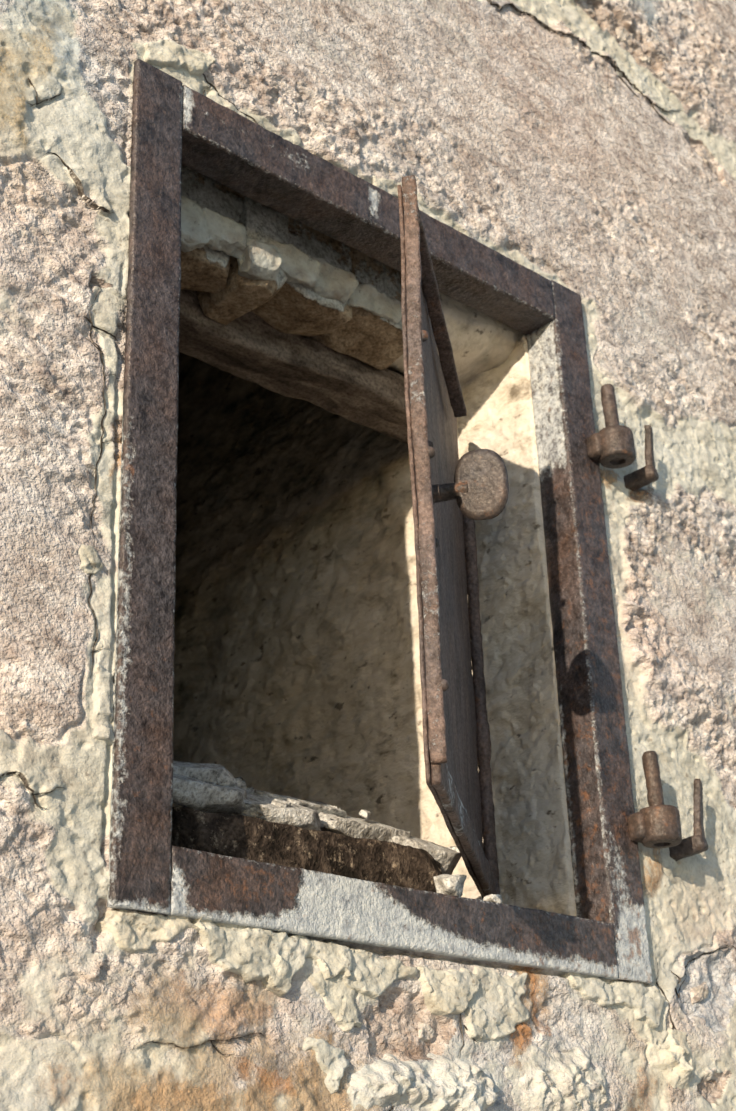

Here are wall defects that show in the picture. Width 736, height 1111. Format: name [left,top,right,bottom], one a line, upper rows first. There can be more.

crack [26,78,63,106]
crack [487,0,684,125]
crack [43,152,113,214]
crack [85,287,120,547]
corrosion [630,487,653,503]
crack [88,574,101,679]
crack [0,771,61,809]
crack [656,946,736,1031]
crack [135,1033,264,1055]